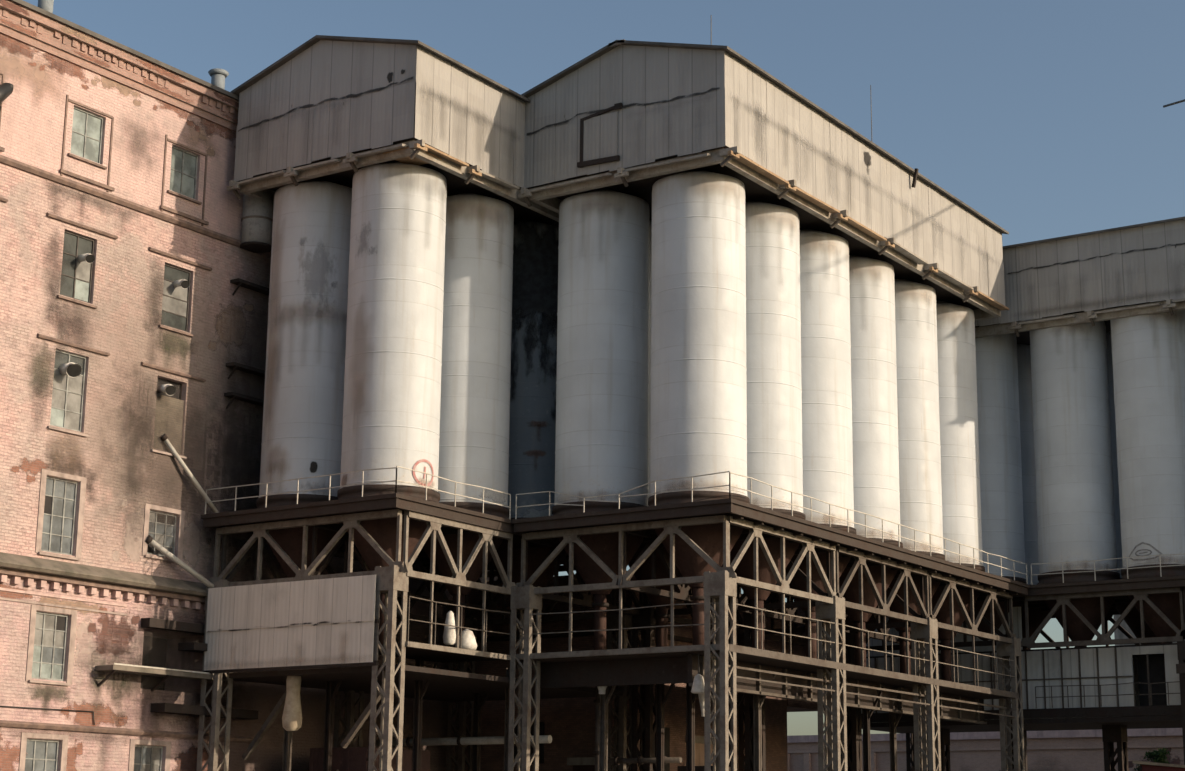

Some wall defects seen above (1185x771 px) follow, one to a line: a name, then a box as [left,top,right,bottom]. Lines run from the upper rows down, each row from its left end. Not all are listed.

spalling [11,458,48,482]
spalling [0,583,140,656]
spalling [61,702,128,727]
spalling [0,734,20,771]